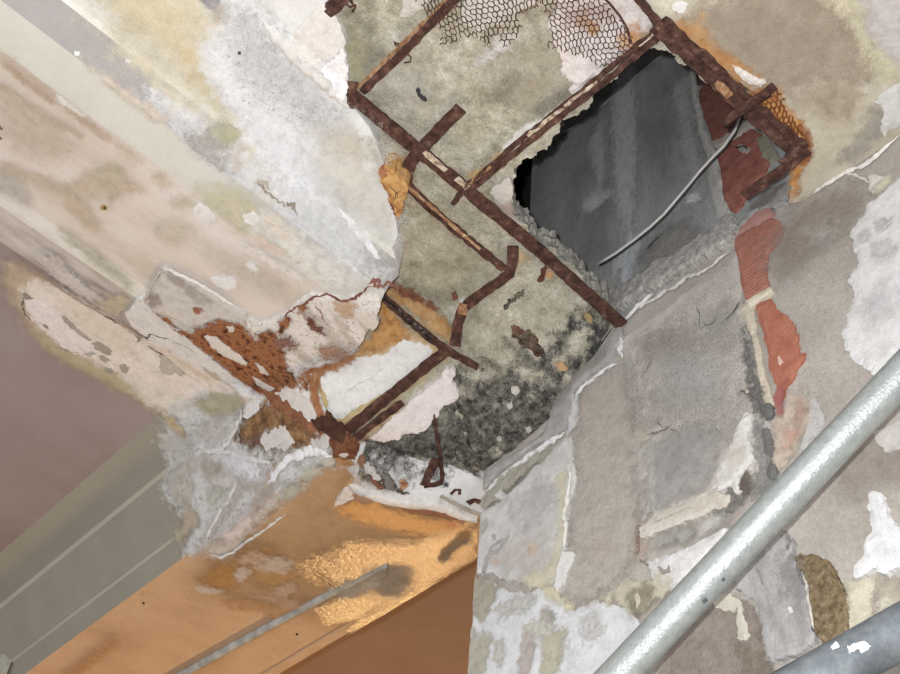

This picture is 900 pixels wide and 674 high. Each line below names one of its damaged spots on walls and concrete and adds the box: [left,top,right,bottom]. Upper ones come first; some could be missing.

flaking render [61,315,129,374]
flaking render [142,265,317,422]
corrosion [153,277,455,469]
spalling [202,0,617,474]
leakage [158,276,678,674]
peeling [334,437,641,674]
corrosion [537,265,554,282]
spalling [649,40,686,66]
flaking render [696,74,780,214]
corrosion [673,8,817,202]
peeling [732,65,766,93]
flaking render [622,174,900,592]